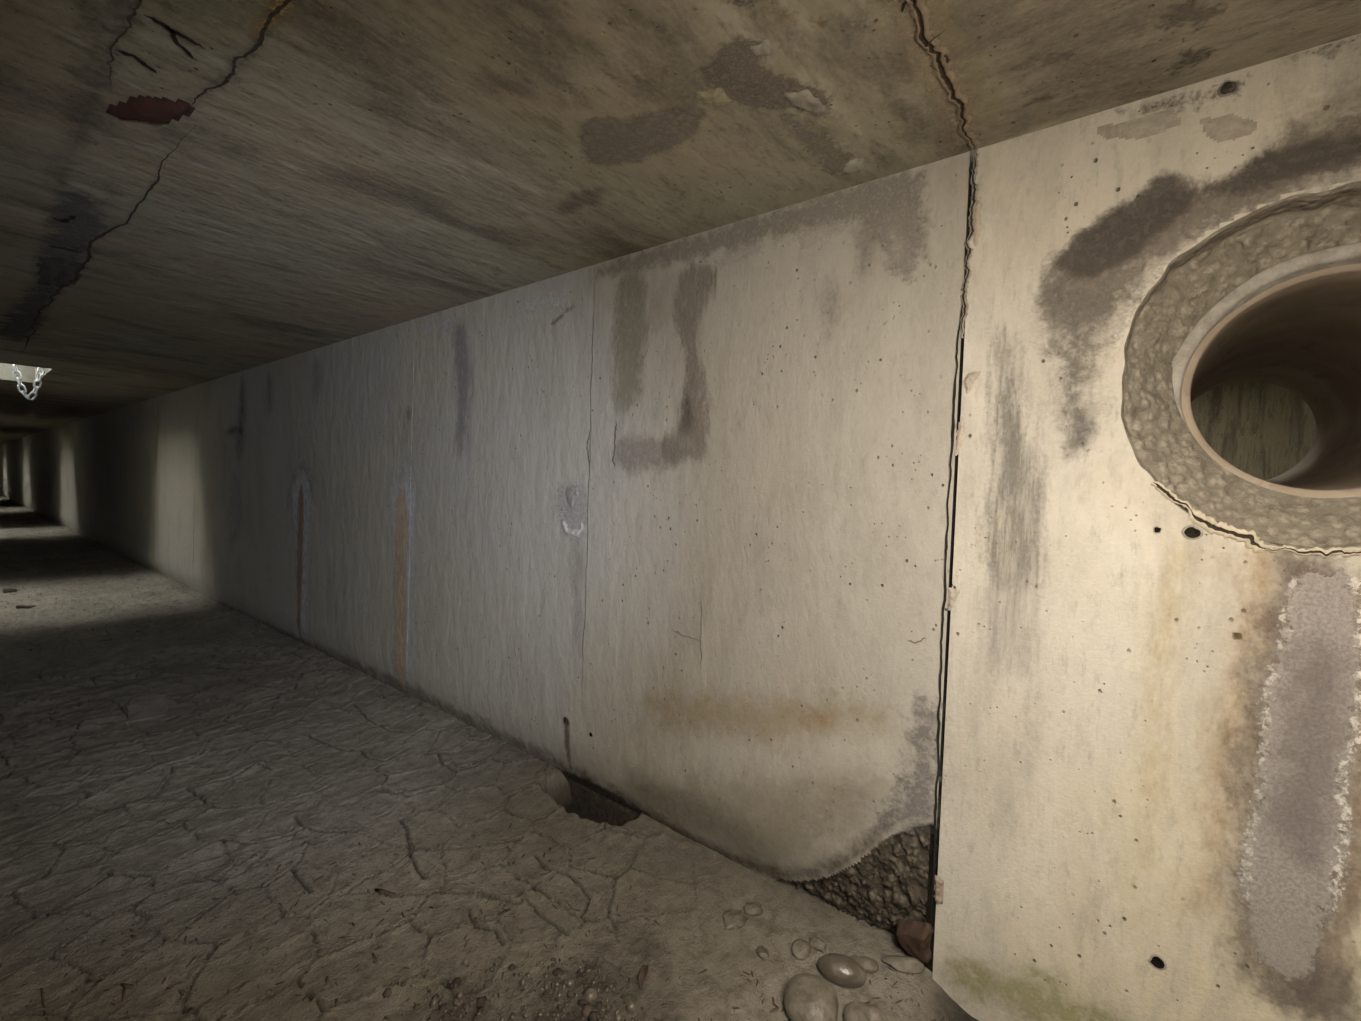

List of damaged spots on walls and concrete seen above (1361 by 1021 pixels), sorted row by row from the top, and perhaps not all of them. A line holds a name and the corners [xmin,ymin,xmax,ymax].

rust [106,95,195,124]
crack [19,0,292,355]
water stain [599,171,926,468]
crack [890,0,983,933]
water stain [1041,116,1361,446]
spalling [792,825,934,964]
water stain [1233,552,1361,1018]